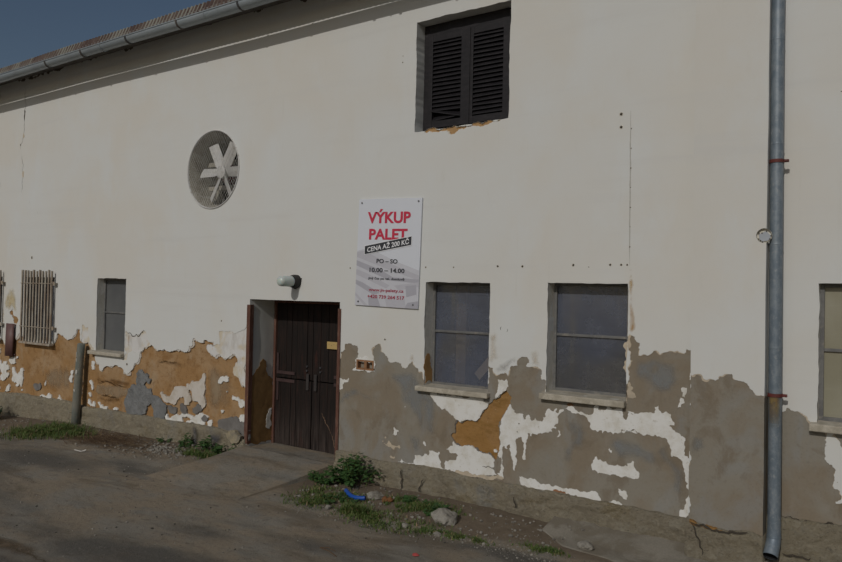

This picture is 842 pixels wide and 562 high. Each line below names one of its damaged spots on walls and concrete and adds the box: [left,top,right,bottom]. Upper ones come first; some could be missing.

flaking render [425,120,500,135]
flaking render [0,325,273,445]
peeling [338,335,768,536]
peeling [781,408,842,525]